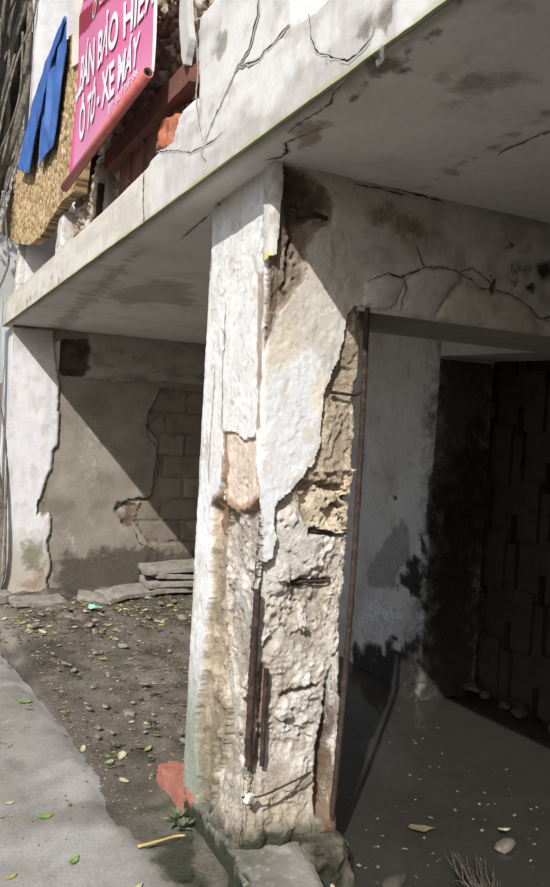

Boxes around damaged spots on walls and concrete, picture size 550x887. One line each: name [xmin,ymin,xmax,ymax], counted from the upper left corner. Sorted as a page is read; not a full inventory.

crack [156,0,375,162]
crack [498,131,550,156]
crack [139,172,147,223]
crack [367,244,550,320]
mould [511,260,550,293]
hole [55,338,93,377]
spalling [113,499,141,527]
water stain [352,342,500,704]
spalling [194,305,364,850]